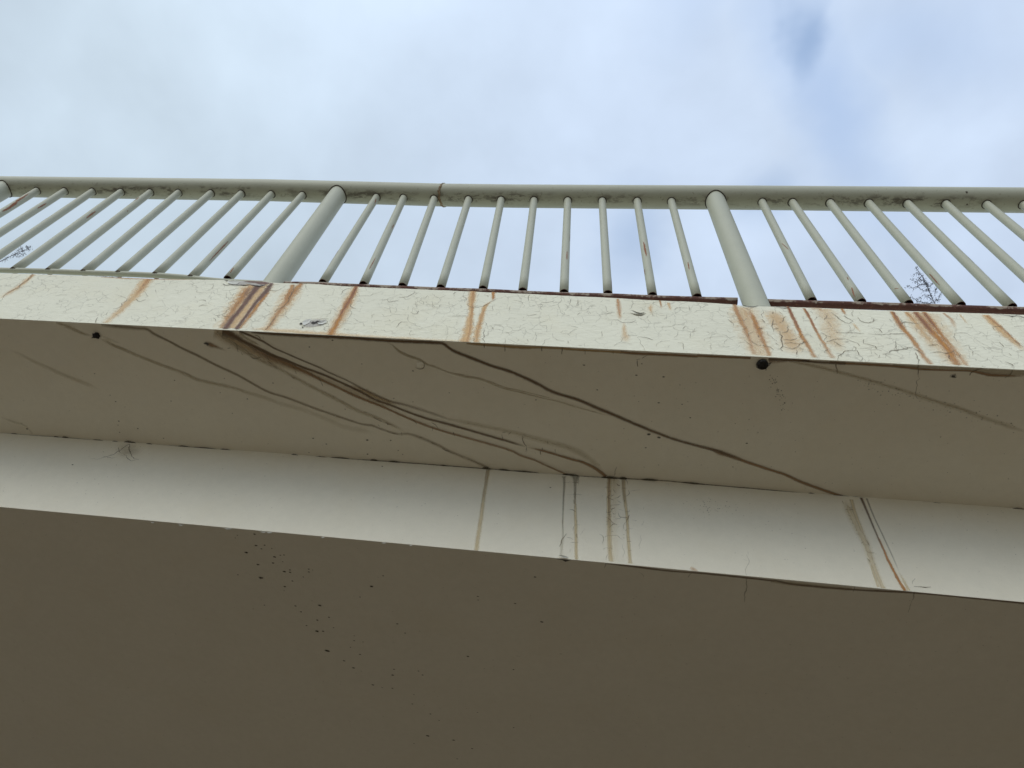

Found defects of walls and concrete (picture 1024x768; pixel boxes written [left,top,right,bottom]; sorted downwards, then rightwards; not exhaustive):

corrosion [222,283,273,329]
crack [210,285,323,386]
corrosion [266,283,302,330]
corrosion [328,286,358,335]
corrosion [460,291,495,342]
crack [342,287,1024,395]
corrosion [733,304,831,357]
corrosion [890,311,961,365]
water stain [108,325,1024,604]
corrosion [860,498,910,591]